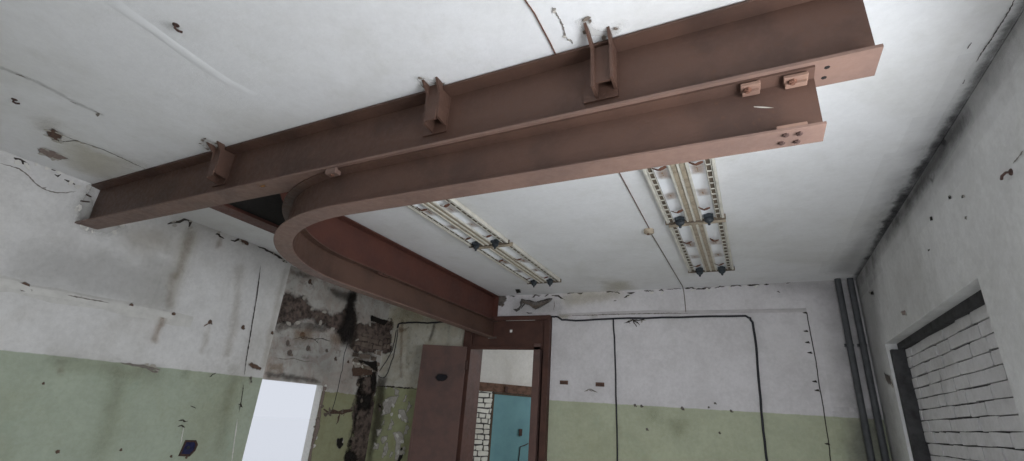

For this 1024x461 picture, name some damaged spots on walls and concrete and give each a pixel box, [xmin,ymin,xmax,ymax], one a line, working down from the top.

damp [855,123,960,278]
spalling [272,282,411,461]
flaking render [498,289,555,314]